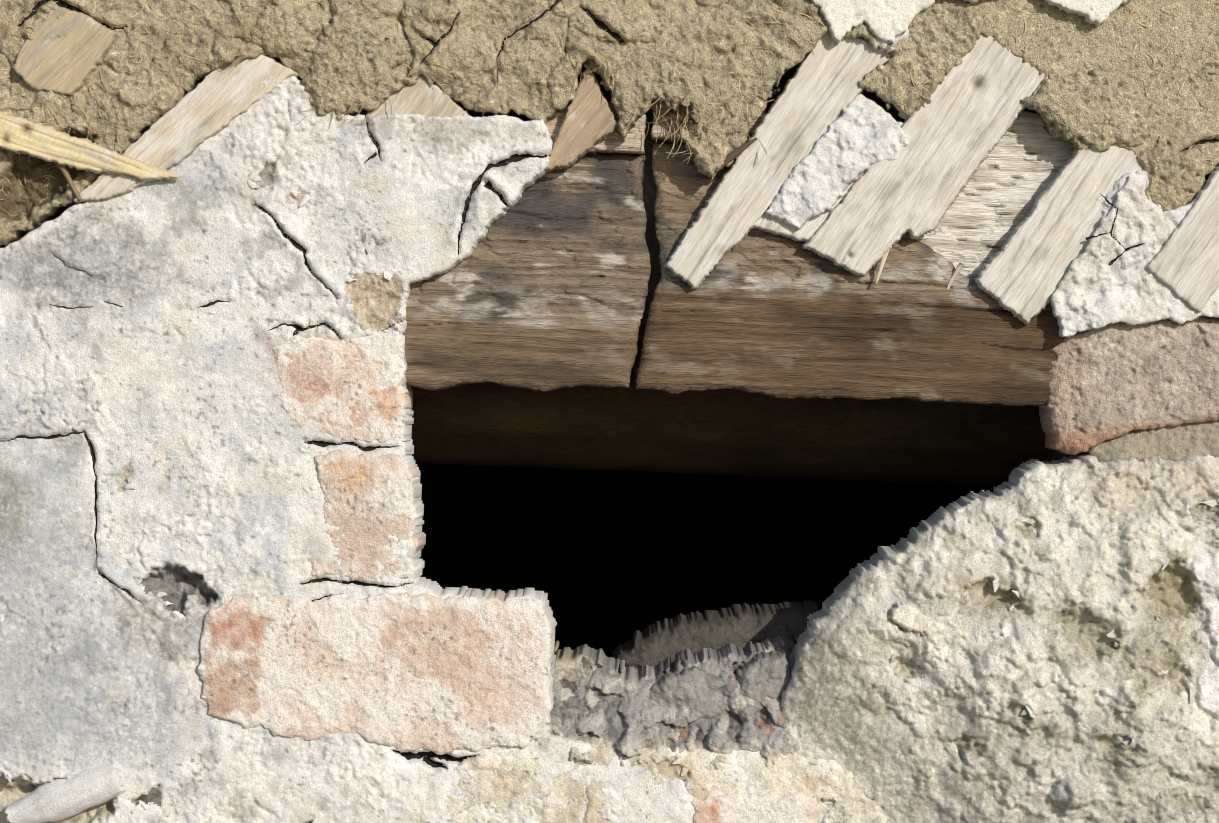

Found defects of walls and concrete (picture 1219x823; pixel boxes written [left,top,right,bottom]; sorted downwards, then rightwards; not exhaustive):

crack [18,0,128,30]
crack [496,0,625,82]
peeling [812,0,935,45]
peeling [1045,0,1131,28]
spalling [248,158,279,189]
crack [458,154,550,255]
crack [255,204,334,294]
crack [270,323,342,340]
crack [0,431,144,605]
spalling [1014,516,1040,539]
spalling [134,564,218,622]
spalling [960,577,1030,612]